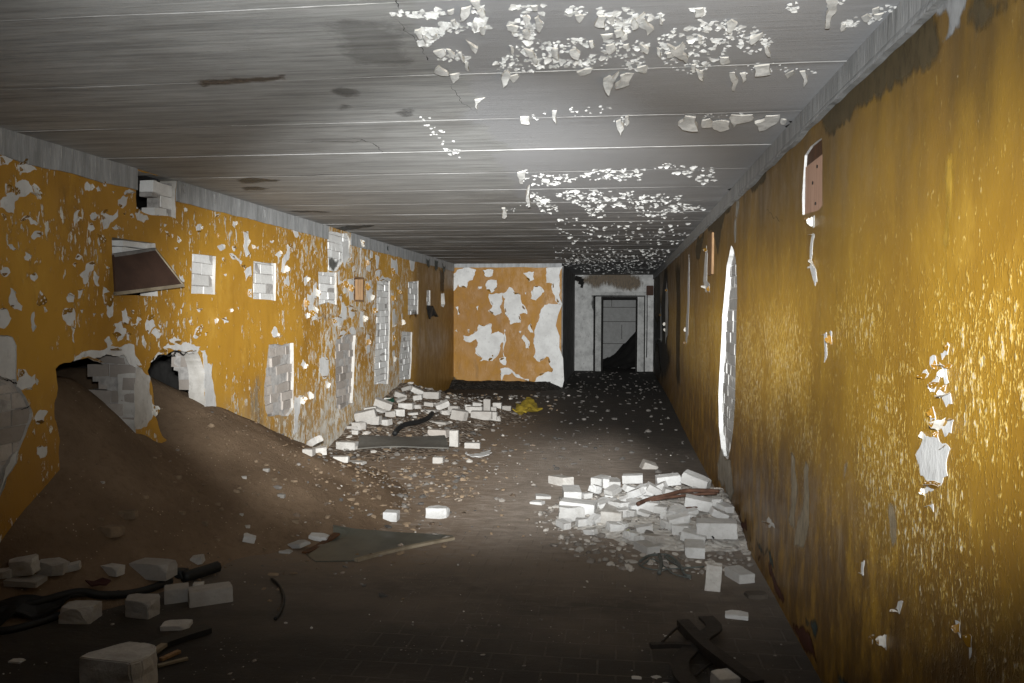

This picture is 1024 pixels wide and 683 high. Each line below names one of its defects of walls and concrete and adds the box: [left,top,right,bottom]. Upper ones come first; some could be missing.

peeling [389,0,493,83]
peeling [492,4,817,135]
peeling [825,0,897,32]
peeling [0,155,43,240]
spalling [0,267,48,492]
spalling [73,180,204,250]
flaking render [62,254,239,429]
peeling [217,221,304,297]
spalling [264,239,415,434]
flaking render [453,163,717,387]
peeling [804,215,817,285]
peeling [915,342,954,512]